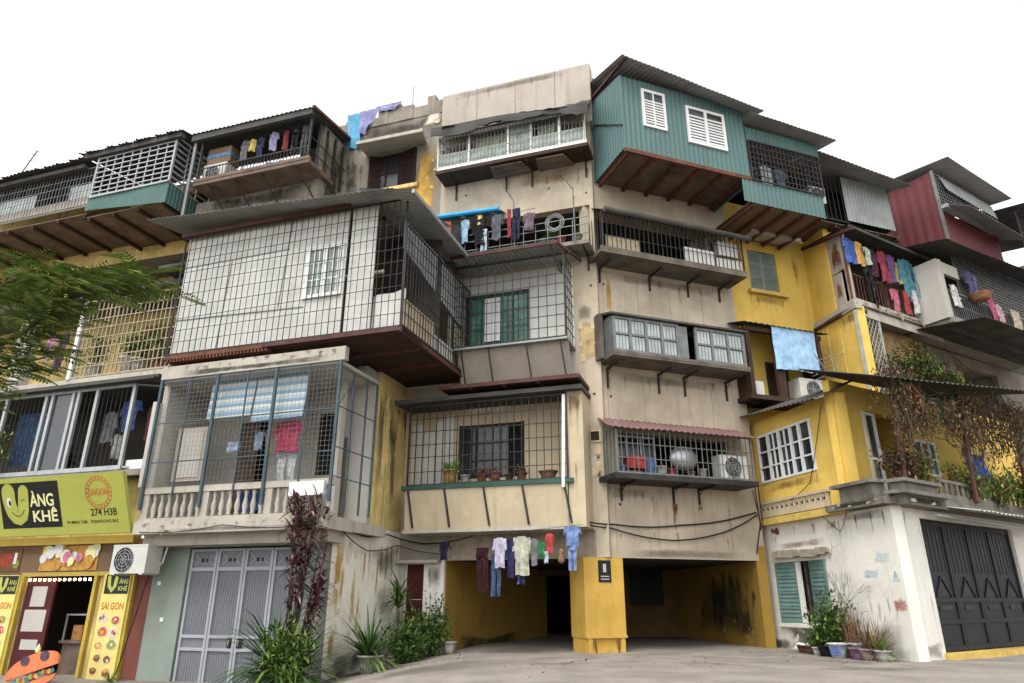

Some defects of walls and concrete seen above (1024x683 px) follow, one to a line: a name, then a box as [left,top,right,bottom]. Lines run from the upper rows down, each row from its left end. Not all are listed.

peeling [414,146,438,206]
peeling [578,308,595,363]
damp [379,414,407,469]
peeling [866,554,899,581]